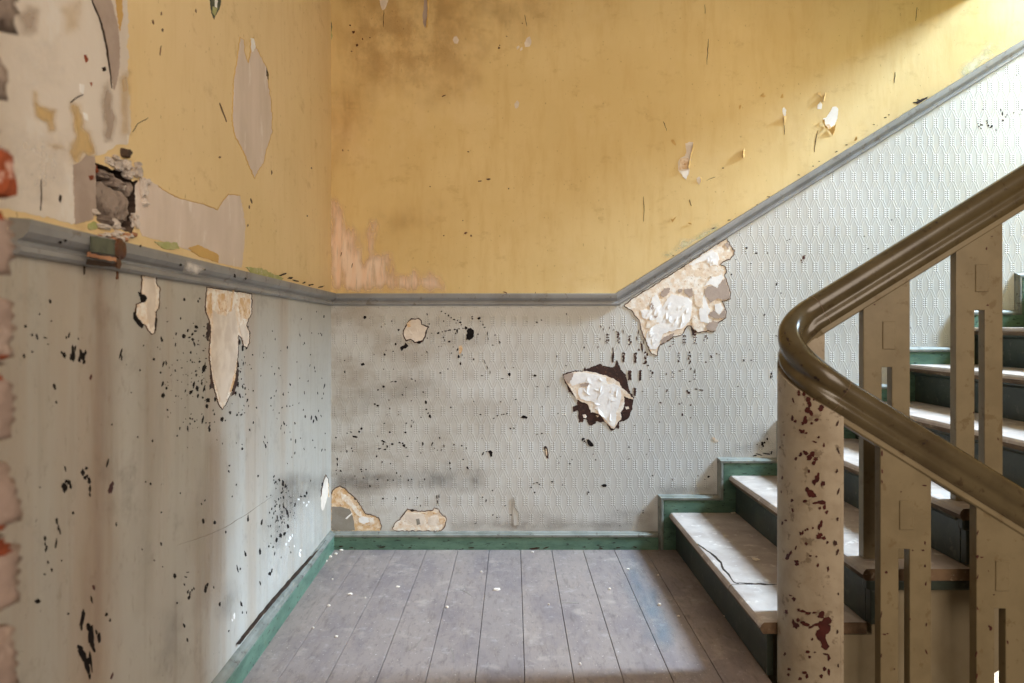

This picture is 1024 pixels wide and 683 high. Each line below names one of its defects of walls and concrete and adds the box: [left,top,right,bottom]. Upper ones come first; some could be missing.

peeling [671,140,702,184]
peeling [817,91,838,135]
peeling [0,0,439,464]
peeling [374,311,501,376]
peeling [360,369,469,487]
peeling [244,427,363,558]
flaking render [0,461,23,683]
crack [698,544,776,585]